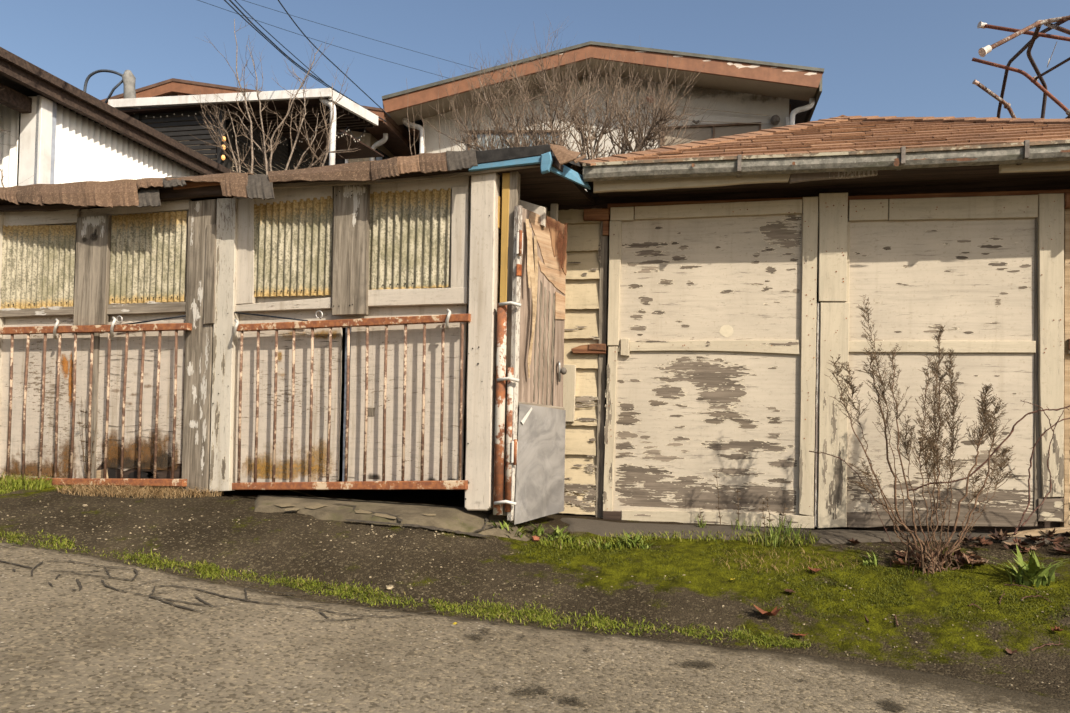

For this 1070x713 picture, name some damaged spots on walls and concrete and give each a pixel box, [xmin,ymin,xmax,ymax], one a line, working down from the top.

peeling [622,232,702,342]
peeling [749,214,802,305]
corrosion [62,354,73,402]
peeling [564,341,799,524]